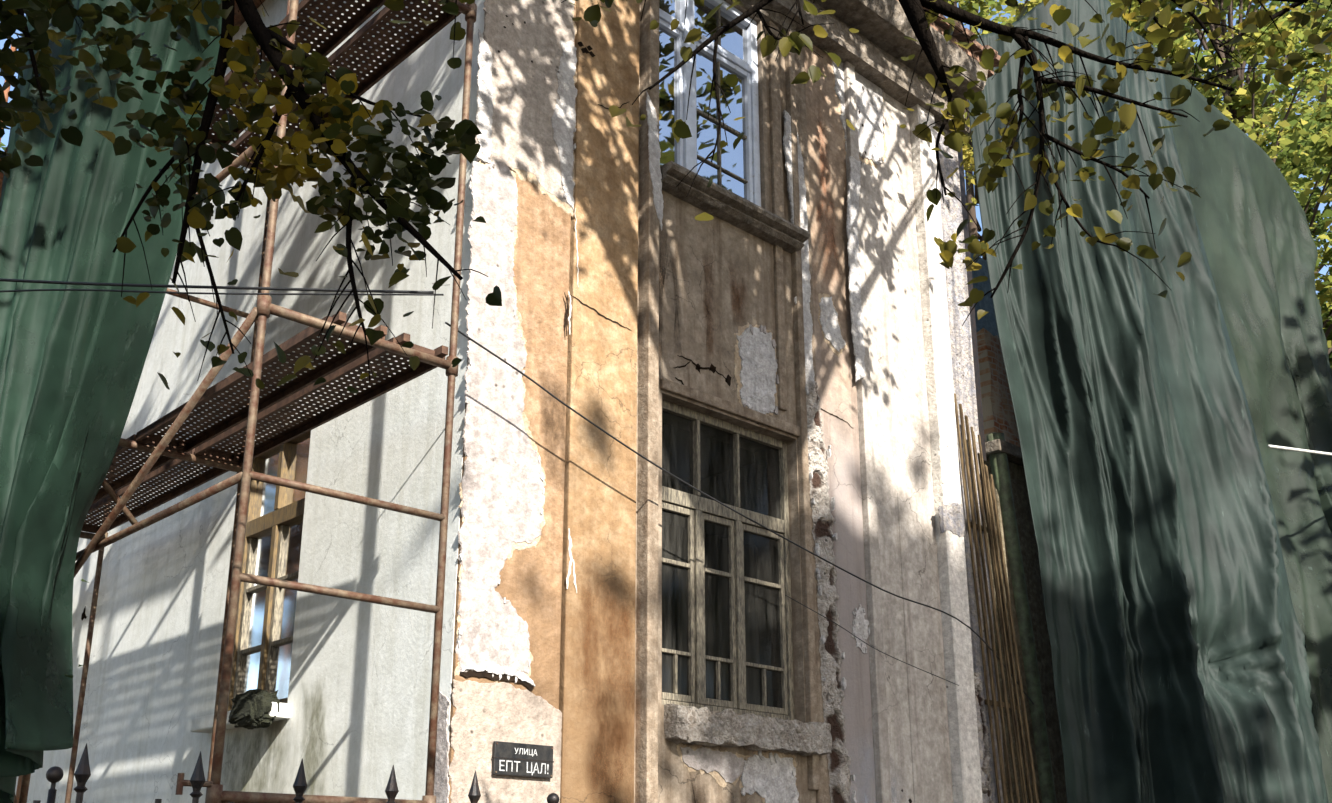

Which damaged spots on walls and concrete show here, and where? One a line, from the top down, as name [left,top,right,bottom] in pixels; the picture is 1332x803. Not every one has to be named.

peeling [434,0,578,803]
crack [675,355,731,386]
flaking render [734,322,779,416]
flaking render [677,743,799,803]